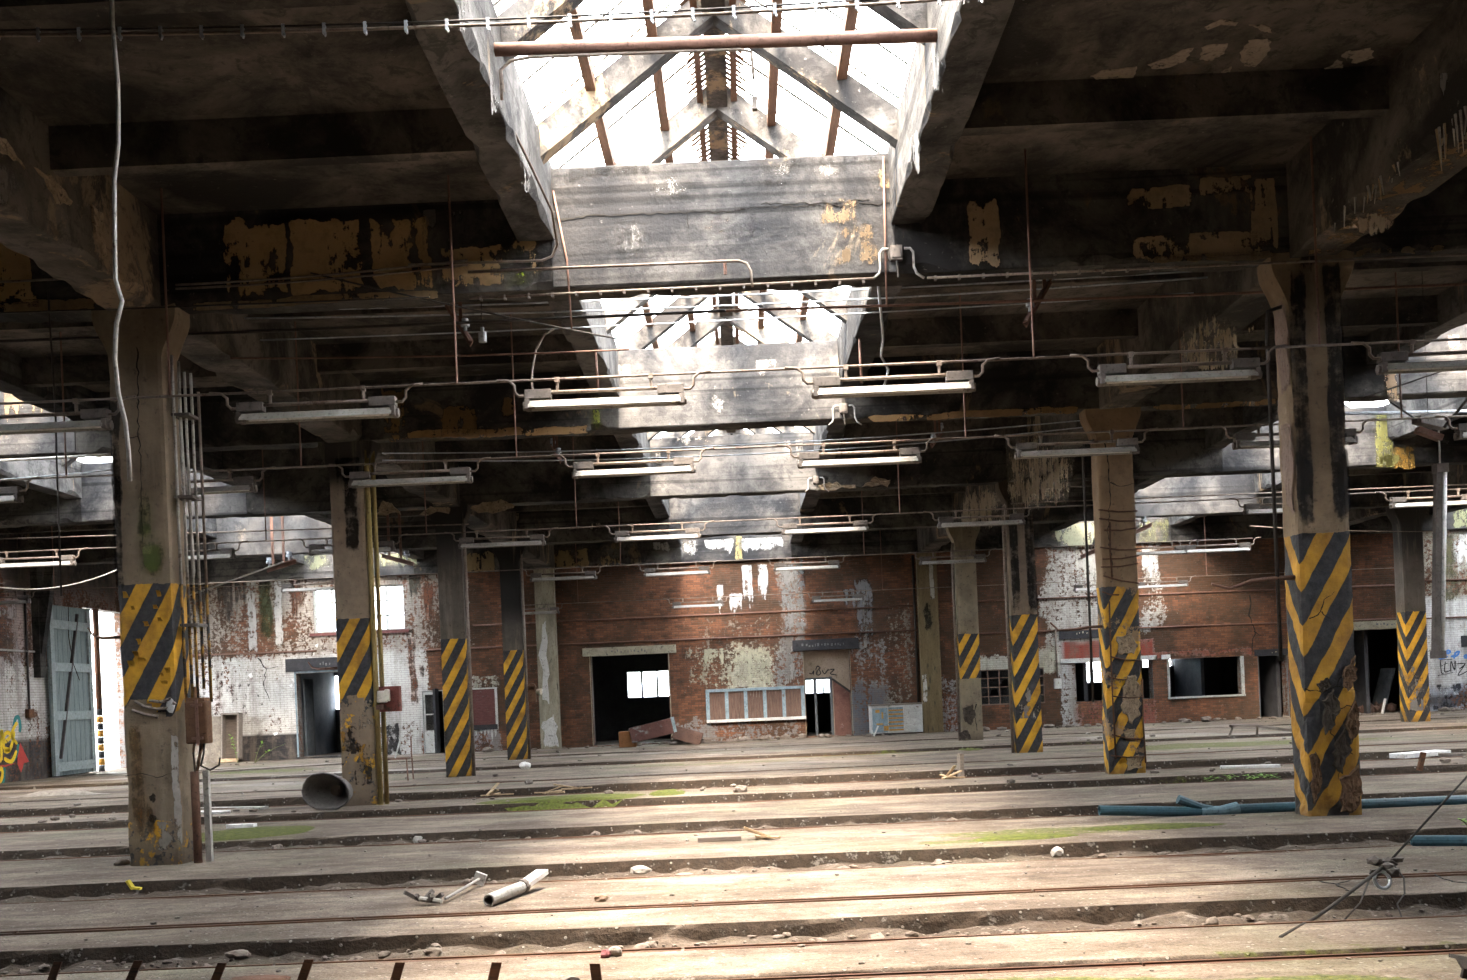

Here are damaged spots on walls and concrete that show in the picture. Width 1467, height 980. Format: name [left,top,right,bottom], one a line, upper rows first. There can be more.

peeling [1091,19,1272,80]
peeling [193,216,537,311]
peeling [821,198,888,264]
peeling [967,199,1001,268]
damp [1290,256,1351,522]
peeling [200,670,263,716]
spalling [1309,655,1363,813]